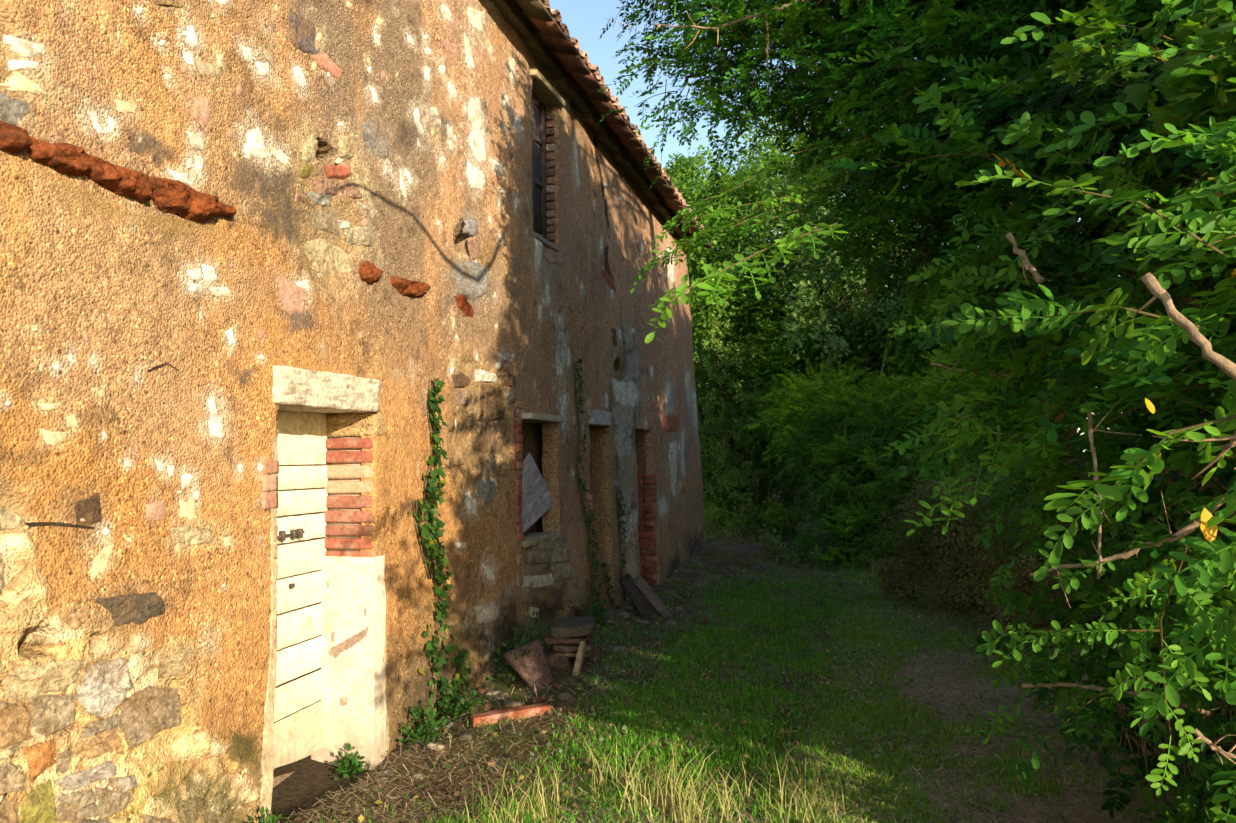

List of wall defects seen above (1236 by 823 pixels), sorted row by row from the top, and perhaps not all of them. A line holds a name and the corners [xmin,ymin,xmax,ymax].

flaking render [373,17,383,45]
flaking render [367,57,385,104]
flaking render [406,1,515,190]
flaking render [503,95,521,135]
crack [593,137,616,299]
flaking render [446,190,532,518]
crack [610,328,618,346]
flaking render [75,493,132,580]
flaking render [144,460,233,553]
flaking render [61,592,165,630]
flaking render [0,648,219,823]